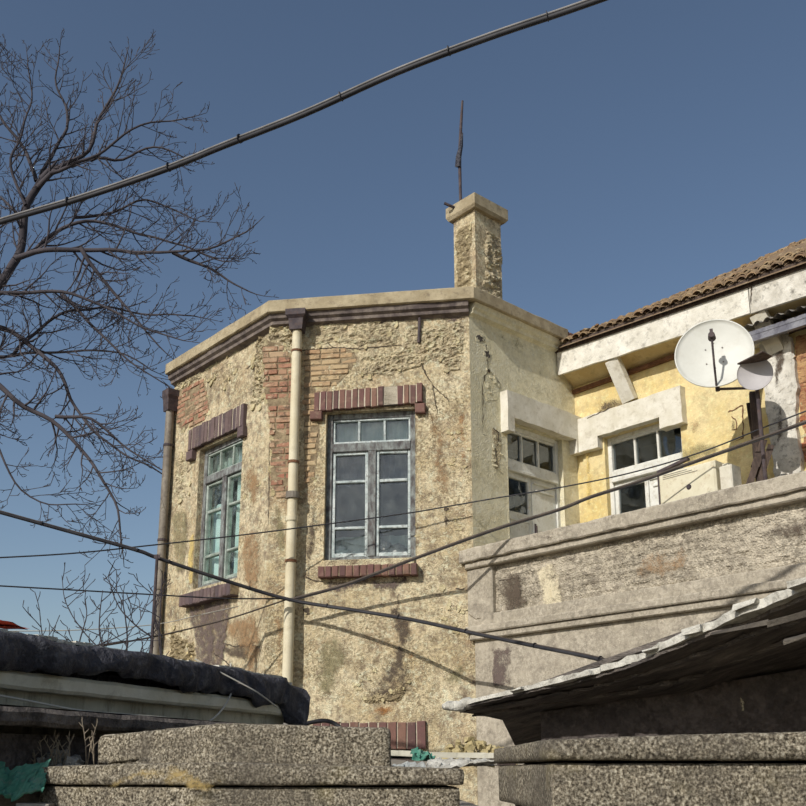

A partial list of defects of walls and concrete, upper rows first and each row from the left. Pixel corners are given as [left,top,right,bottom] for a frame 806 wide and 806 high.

spalling [174,356,239,433]
spalling [243,326,292,503]
crack [302,333,397,371]
spalling [298,320,465,489]
crack [408,349,449,436]
crack [482,345,501,466]
peeling [767,332,806,464]
peeling [175,452,191,504]
leakage [328,576,407,593]
leakage [190,599,260,671]
leakage [371,599,409,696]
leakage [492,648,510,686]